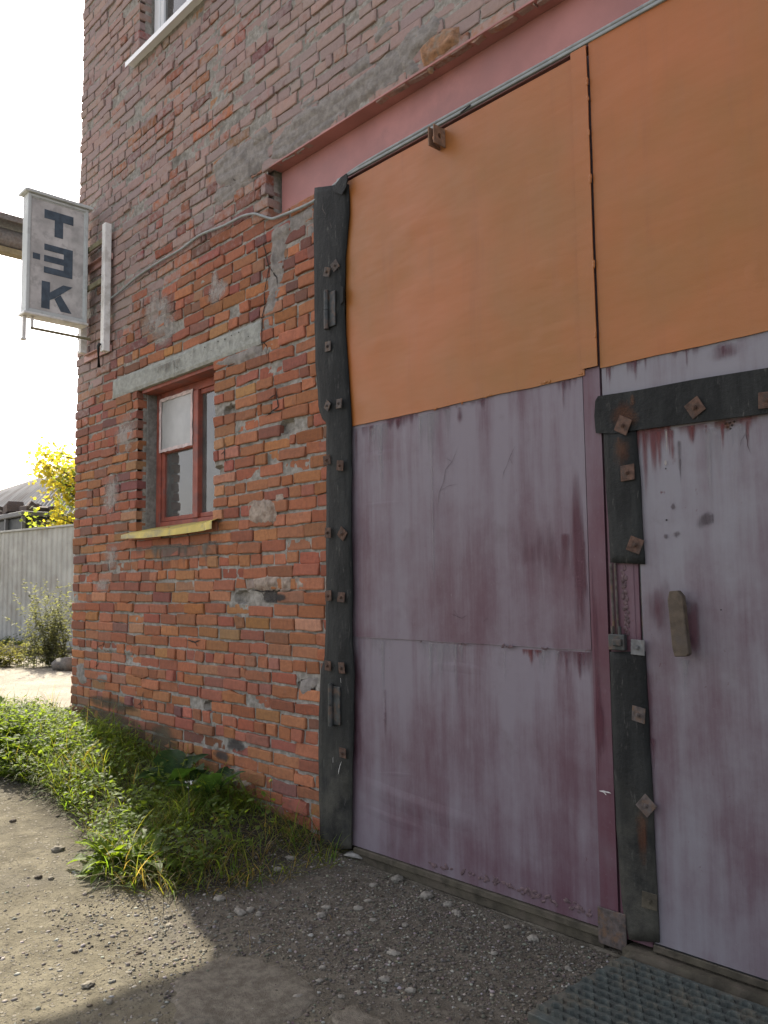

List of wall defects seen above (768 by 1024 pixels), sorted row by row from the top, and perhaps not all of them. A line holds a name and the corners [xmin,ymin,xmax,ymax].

spalling [248,494,284,523]